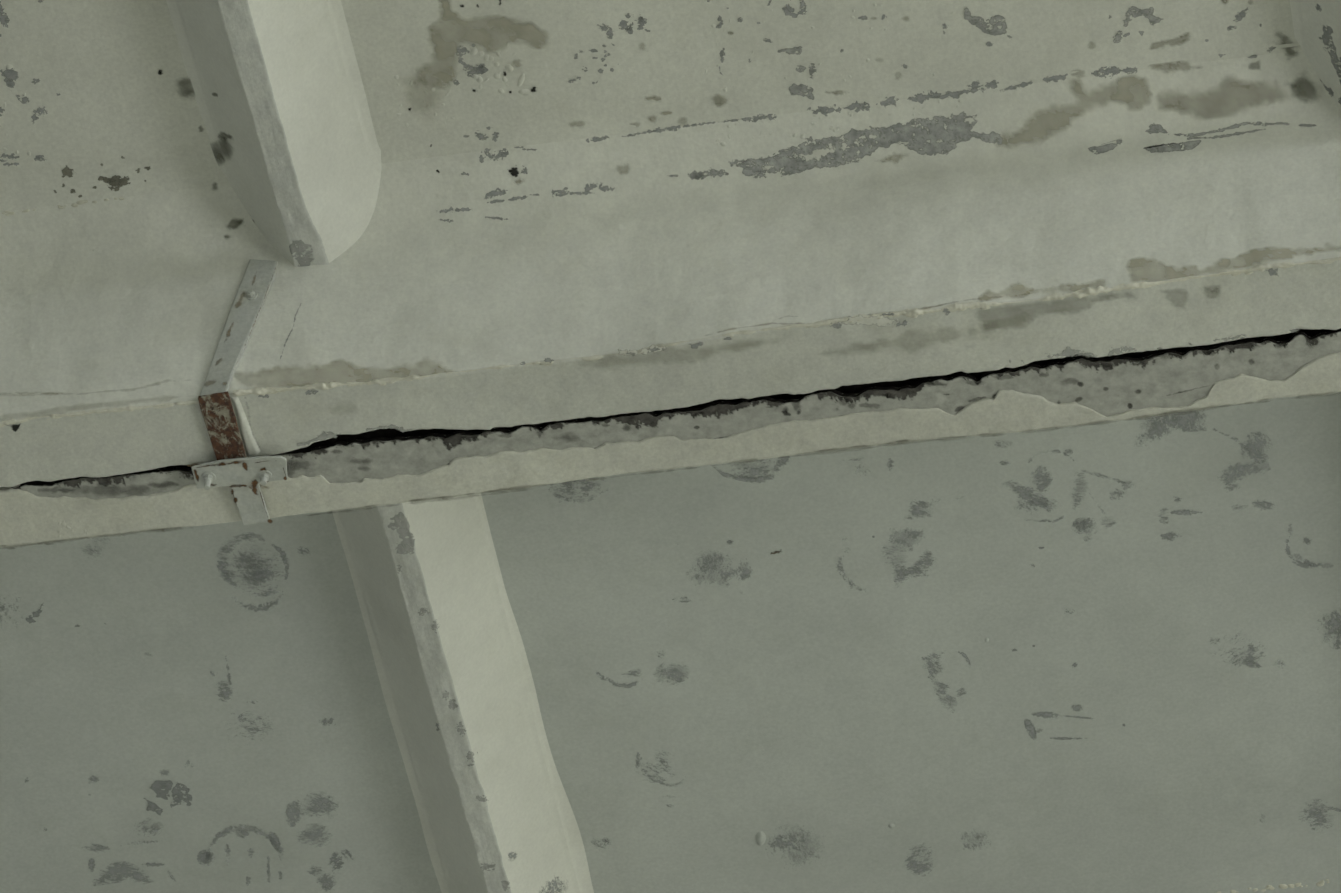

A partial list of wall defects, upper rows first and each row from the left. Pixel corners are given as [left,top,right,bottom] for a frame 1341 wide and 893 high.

water stain [421,0,542,85]
peeling [569,13,650,84]
peeling [964,8,1012,46]
peeling [1091,66,1137,79]
peeling [0,68,47,123]
peeling [464,127,536,163]
peeling [586,114,776,143]
spalling [670,39,1068,180]
peeling [1144,122,1316,153]
peeling [485,183,614,220]
crack [267,328,1341,456]
crack [0,464,200,490]